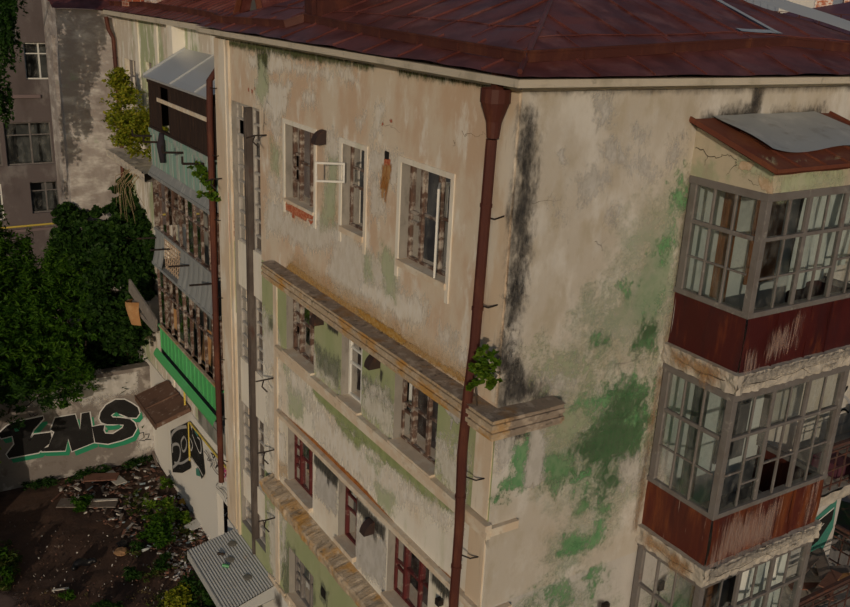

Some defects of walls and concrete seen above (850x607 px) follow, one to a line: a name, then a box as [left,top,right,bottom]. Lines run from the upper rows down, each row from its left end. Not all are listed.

peeling [286,158,337,226]
rust [380,165,392,201]
crack [696,147,758,186]
peeling [381,248,396,300]
water stain [499,283,523,373]
water stain [493,429,546,488]
water stain [619,441,652,529]
peeling [354,513,387,592]